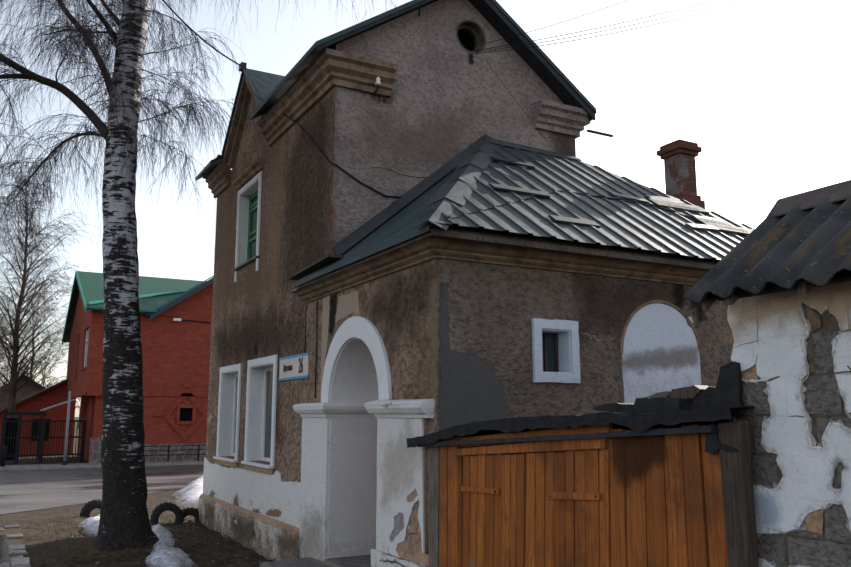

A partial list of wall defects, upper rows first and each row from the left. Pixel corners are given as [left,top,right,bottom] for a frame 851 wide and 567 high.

spalling [801,301,851,448]
spalling [831,460,847,491]
crack [380,558,406,567]
spalling [390,489,429,566]
crack [404,500,418,541]
spalling [757,503,851,567]